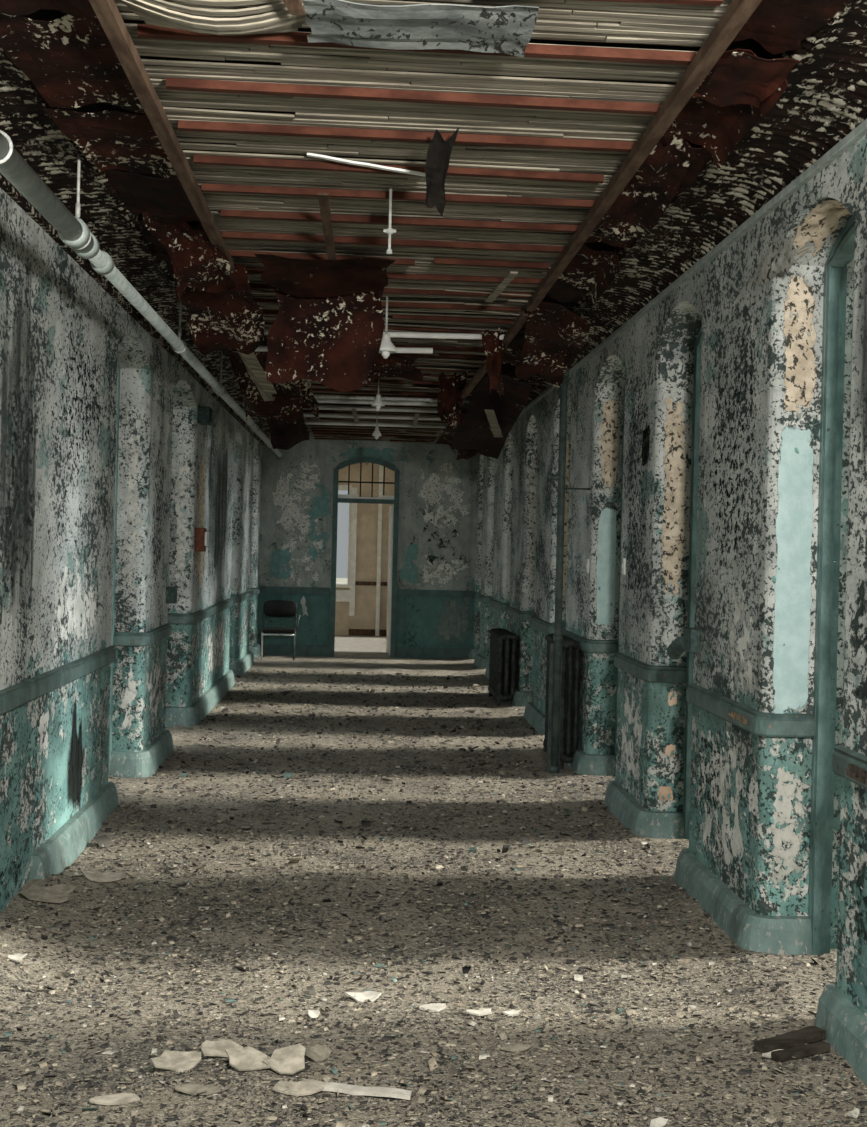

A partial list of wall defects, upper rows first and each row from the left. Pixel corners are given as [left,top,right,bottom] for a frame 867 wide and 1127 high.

leakage [1,296,36,589]
peeling [3,354,37,610]
peeling [50,560,101,662]
peeling [52,323,104,464]
peeling [272,460,325,586]
peeling [414,462,471,587]
peeling [596,375,649,627]
spalling [660,384,687,595]
peeling [707,323,762,574]
peeling [724,200,850,714]
peeling [37,707,49,766]
peeling [849,832,867,966]